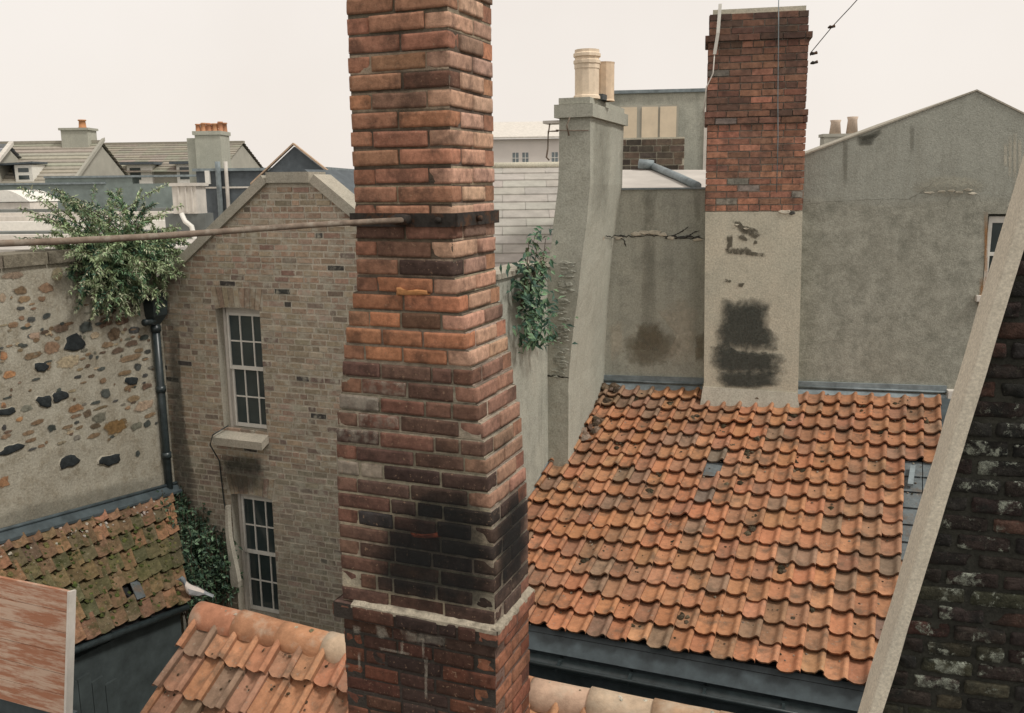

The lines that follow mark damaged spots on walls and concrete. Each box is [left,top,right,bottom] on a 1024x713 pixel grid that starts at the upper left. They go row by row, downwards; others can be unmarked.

crack [605,227,704,246]
spalling [726,222,763,256]